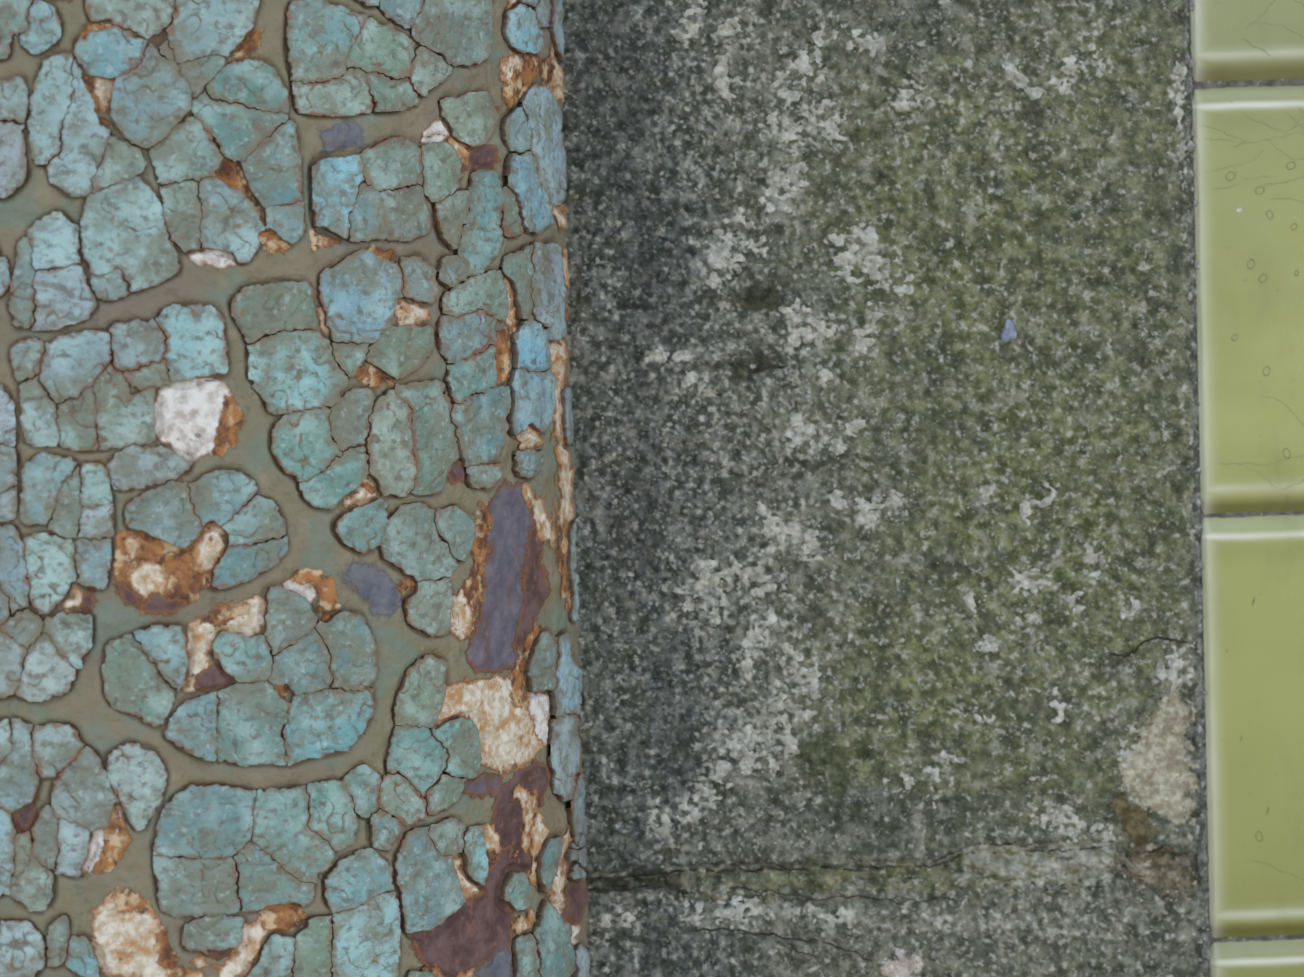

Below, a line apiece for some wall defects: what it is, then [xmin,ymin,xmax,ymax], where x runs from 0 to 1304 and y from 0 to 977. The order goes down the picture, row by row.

peeling [0,0,590,977]
corrosion [62,586,97,614]
corrosion [112,522,266,694]
corrosion [282,568,341,622]
corrosion [273,684,288,697]
spalling [1117,666,1200,832]
crack [593,846,1122,905]
spalling [1115,843,1199,904]
corrosion [90,886,204,977]
crack [694,927,873,961]